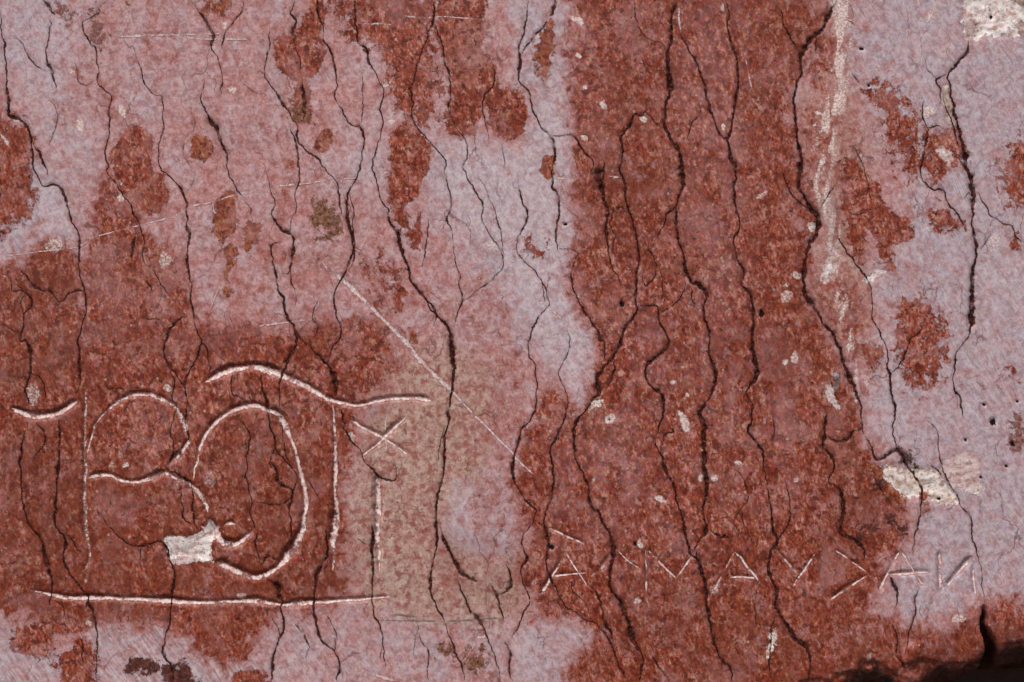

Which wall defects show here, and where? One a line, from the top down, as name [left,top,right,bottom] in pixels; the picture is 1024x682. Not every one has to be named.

spalling [960,0,1024,42]
crack [919,41,1021,418]
crack [0,0,811,681]
crack [776,1,992,653]
spalling [880,438,986,508]
spalling [164,519,220,565]
crack [889,576,919,669]